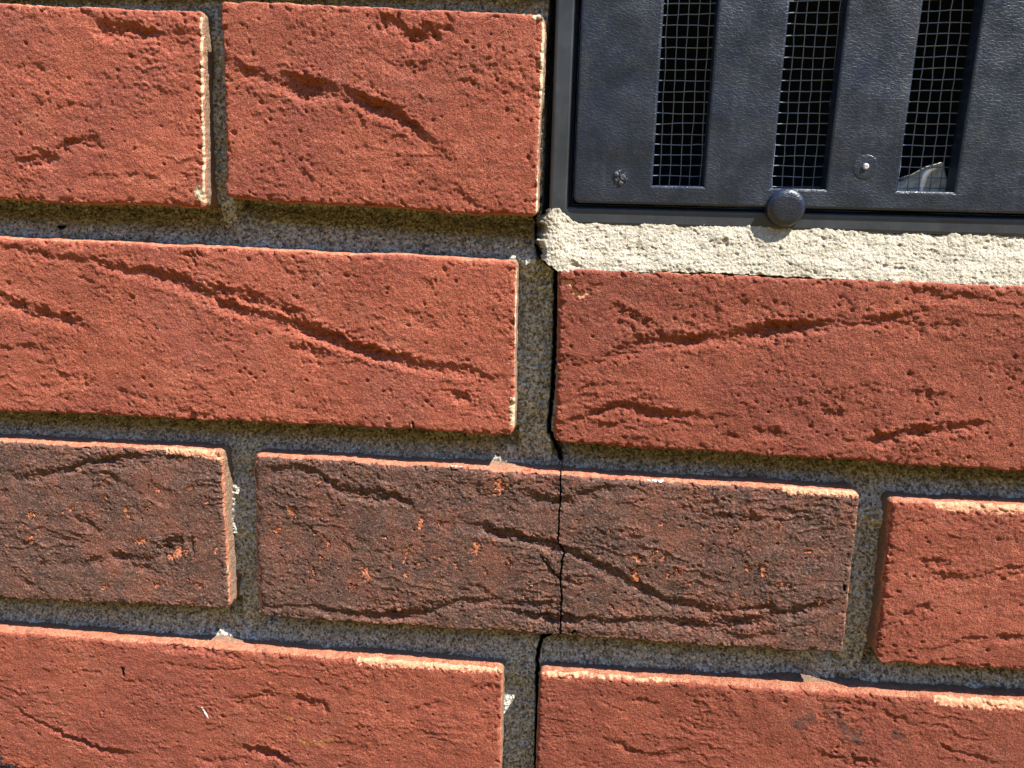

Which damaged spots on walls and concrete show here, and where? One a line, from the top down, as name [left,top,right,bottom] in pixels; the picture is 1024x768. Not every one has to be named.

crack [533,199,565,768]